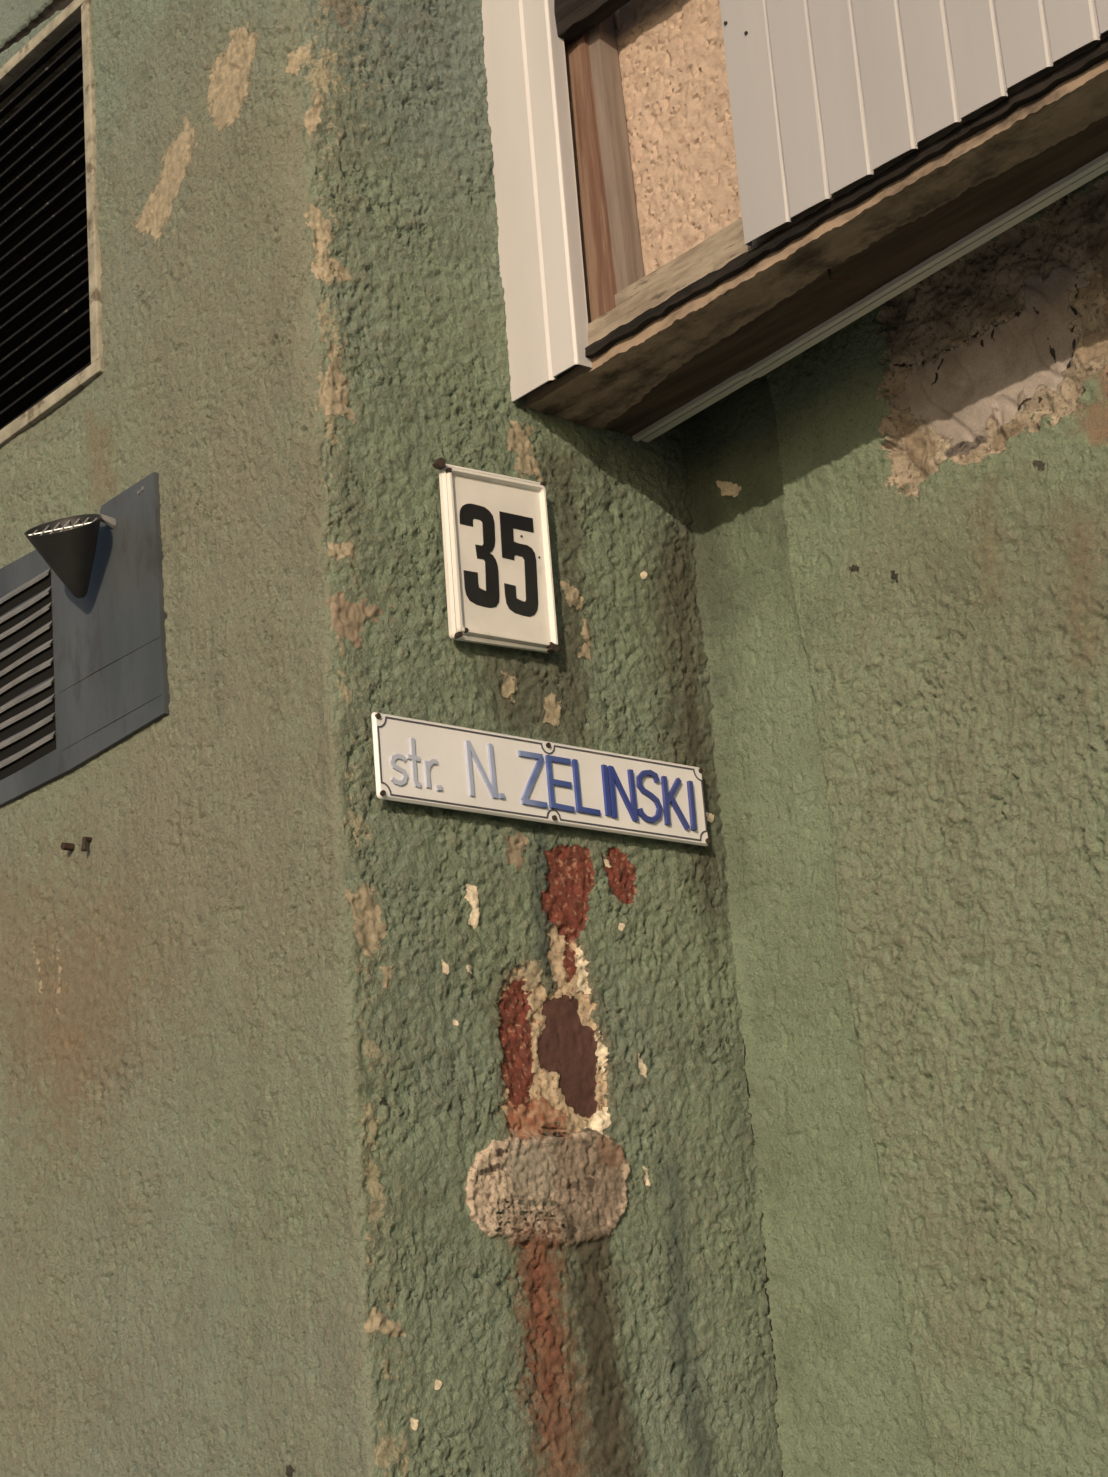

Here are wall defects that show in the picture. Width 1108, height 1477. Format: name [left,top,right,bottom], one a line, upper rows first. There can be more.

crack [0,0,74,54]
peeling [203,22,258,131]
peeling [135,116,199,242]
flaking render [874,176,1108,498]
peeling [505,828,529,872]
peeling [464,844,651,1248]